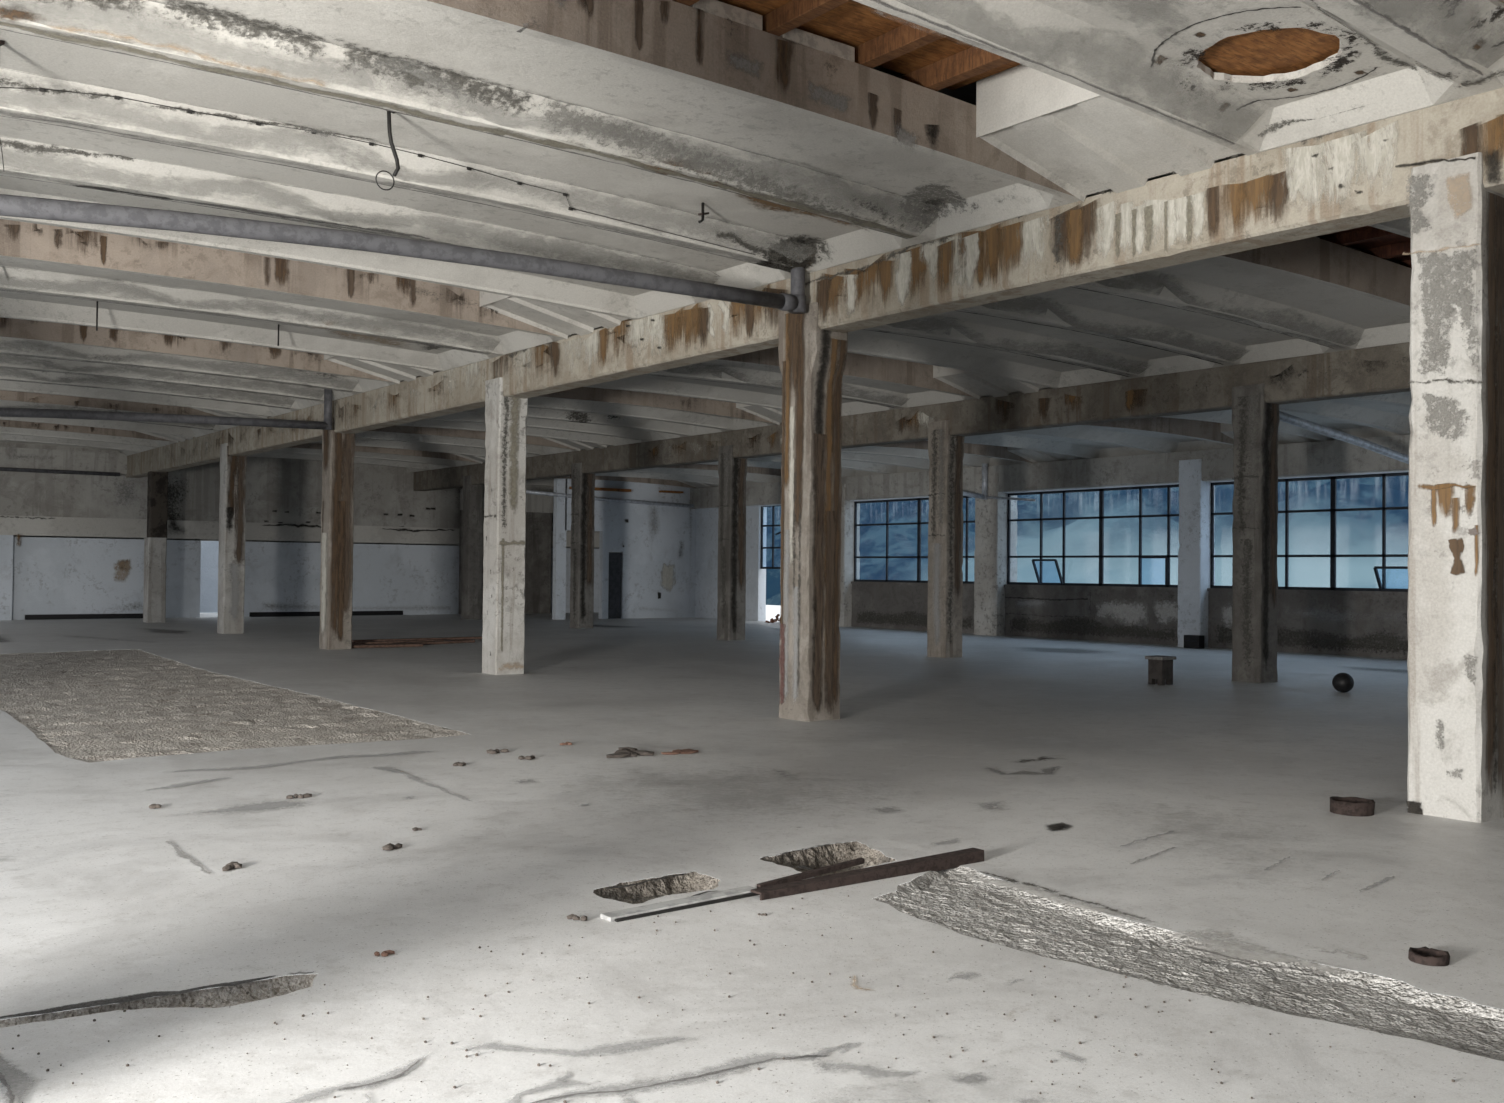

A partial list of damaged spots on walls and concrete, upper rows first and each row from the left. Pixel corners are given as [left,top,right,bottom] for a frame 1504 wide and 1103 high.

rust [1461,114,1504,158]
rust [1207,170,1290,236]
rust [1052,200,1096,264]
rust [664,303,710,348]
rust [1418,483,1478,575]
spalling [760,841,896,877]
spalling [593,871,720,904]
spalling [956,871,1151,922]
spalling [1171,929,1366,980]
crack [0,1056,34,1103]
crack [288,1057,423,1103]
crack [472,1037,857,1103]